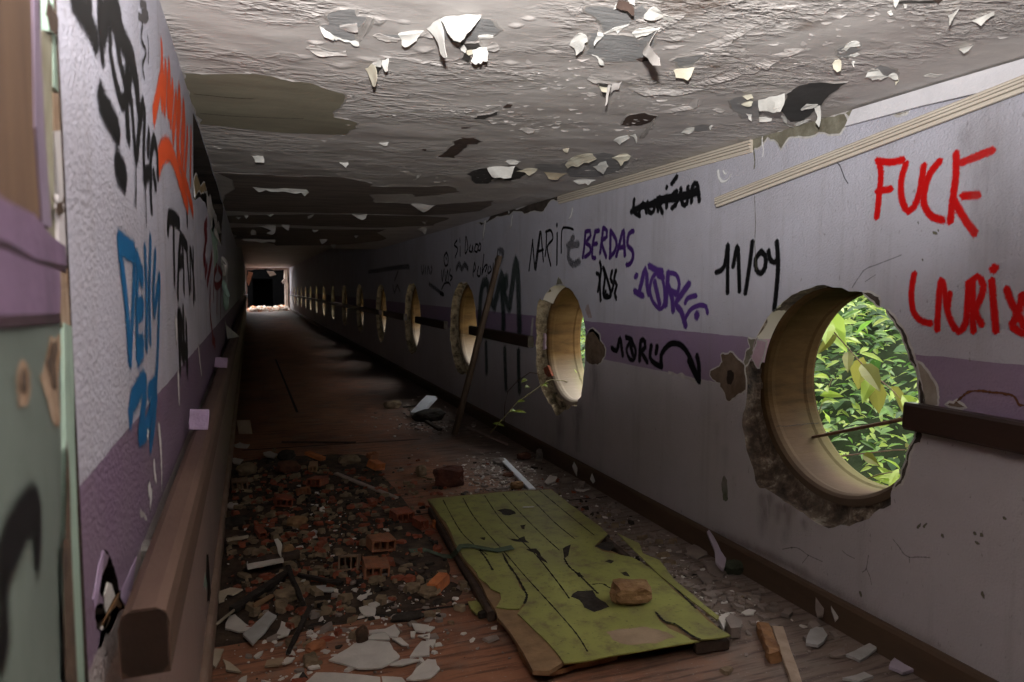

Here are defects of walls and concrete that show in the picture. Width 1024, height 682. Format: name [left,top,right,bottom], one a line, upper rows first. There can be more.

peeling [972,11,998,26]
peeling [182,0,959,311]
flaking render [450,282,468,375]
flaking render [530,277,577,416]
flaking render [862,290,967,410]
flaking render [668,320,924,528]
spalling [93,550,137,649]